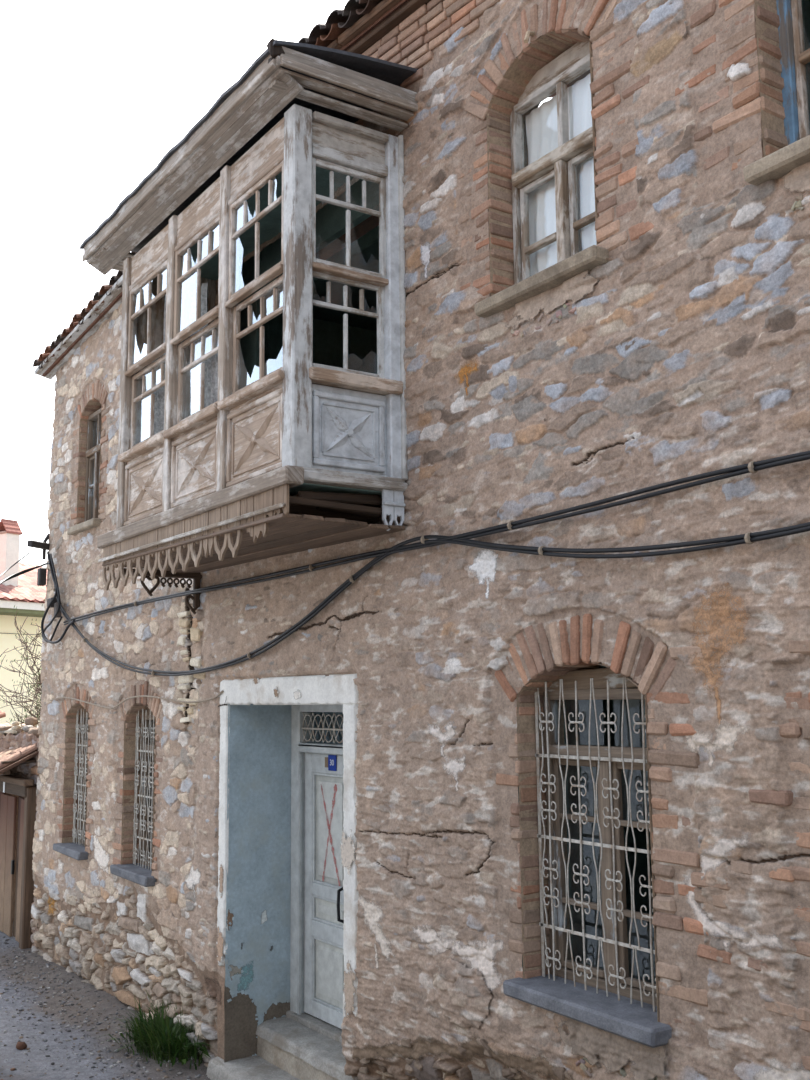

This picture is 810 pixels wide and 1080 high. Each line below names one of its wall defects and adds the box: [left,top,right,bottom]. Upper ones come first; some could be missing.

crack [268,596,379,639]
crack [361,830,495,879]
spalling [216,908,290,1062]